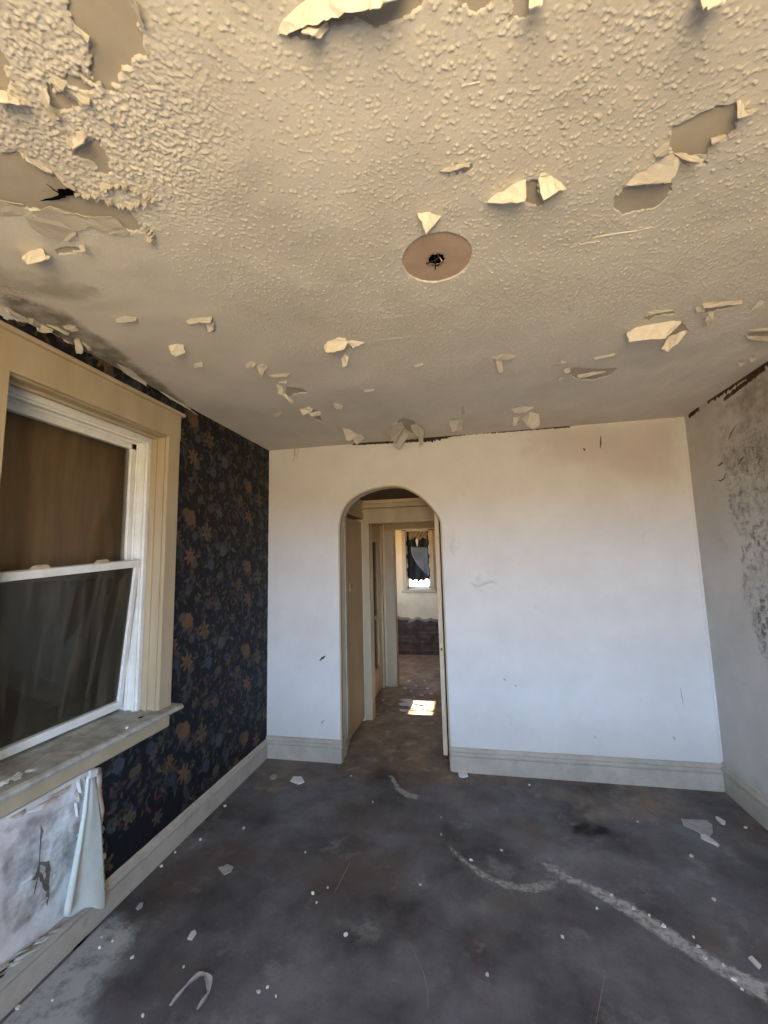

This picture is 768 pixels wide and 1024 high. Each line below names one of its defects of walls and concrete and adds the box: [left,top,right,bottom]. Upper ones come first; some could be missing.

peeling [277,0,423,41]
peeling [0,49,29,107]
peeling [42,0,146,120]
peeling [613,100,758,214]
peeling [0,130,156,265]
peeling [485,171,566,206]
peeling [5,306,92,354]
peeling [169,344,186,357]
peeling [627,309,688,352]
peeling [113,359,197,415]
peeling [245,361,321,421]
flaking render [0,768,97,970]